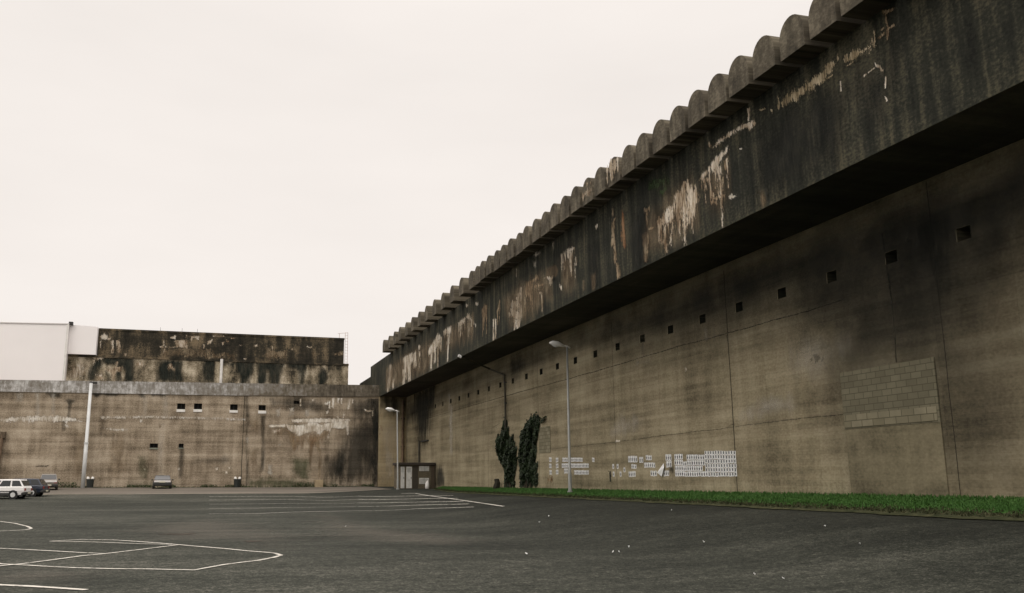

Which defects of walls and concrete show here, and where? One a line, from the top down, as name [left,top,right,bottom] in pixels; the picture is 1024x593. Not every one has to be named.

peeling [642,29,876,263]
damp [634,212,646,263]
damp [728,165,1024,295]
peeling [387,246,577,391]
damp [88,358,134,382]
damp [156,360,183,382]
damp [203,361,215,382]
damp [228,362,307,384]
damp [318,365,341,384]
peeling [259,398,353,445]
damp [310,386,435,484]